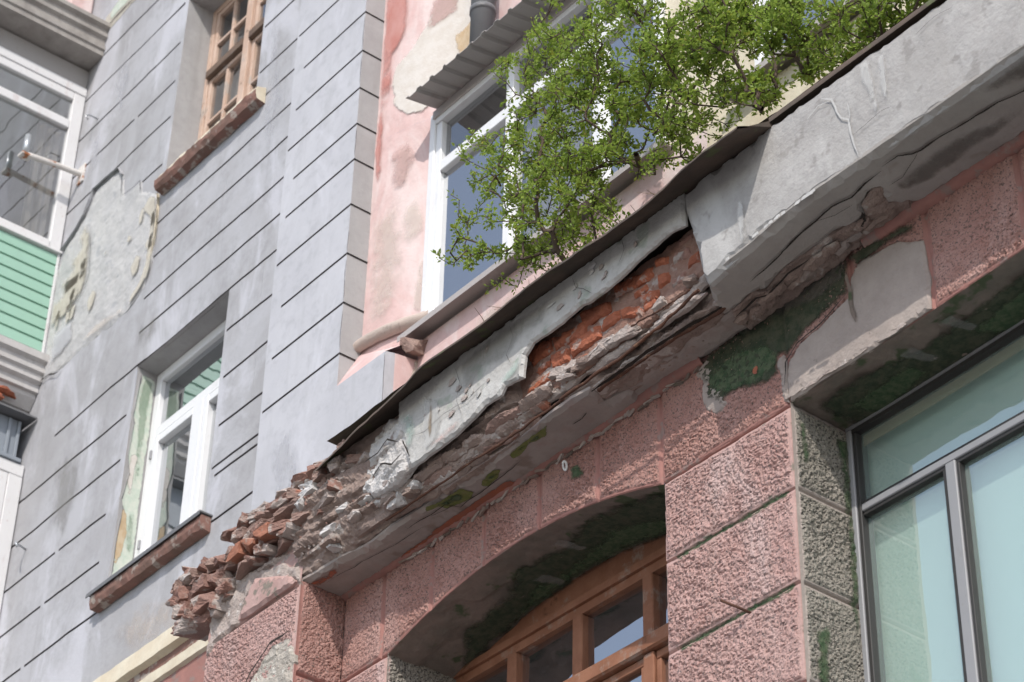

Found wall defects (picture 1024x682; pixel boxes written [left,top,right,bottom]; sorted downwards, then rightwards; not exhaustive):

peeling [392,0,471,114]
peeling [40,167,159,381]
crack [750,90,1024,282]
peeling [108,374,155,578]
flaking render [165,186,932,657]